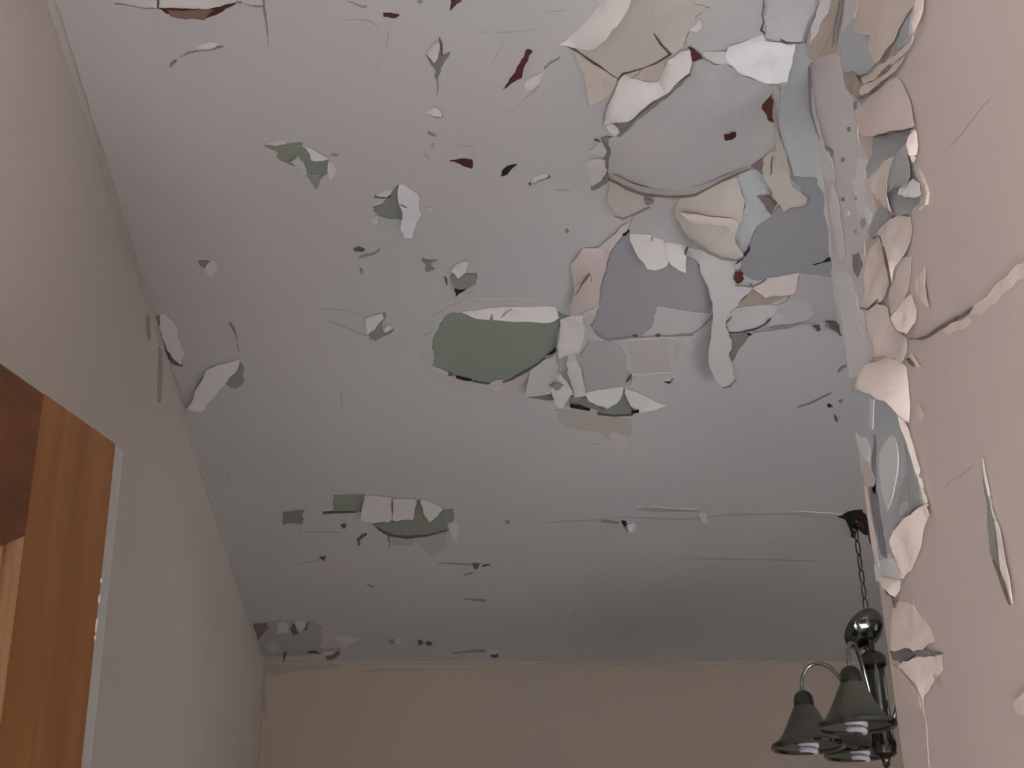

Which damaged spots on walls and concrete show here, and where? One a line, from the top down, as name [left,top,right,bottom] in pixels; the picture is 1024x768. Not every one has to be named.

peeling [118,0,262,20]
flaking render [426,41,451,79]
flaking render [264,140,337,179]
peeling [370,184,421,238]
peeling [156,313,184,367]
flaking render [432,0,943,698]
peeling [187,358,244,412]
peeling [282,510,305,525]
flaking render [333,494,459,546]
peeling [982,457,1013,604]
peeling [253,623,269,641]